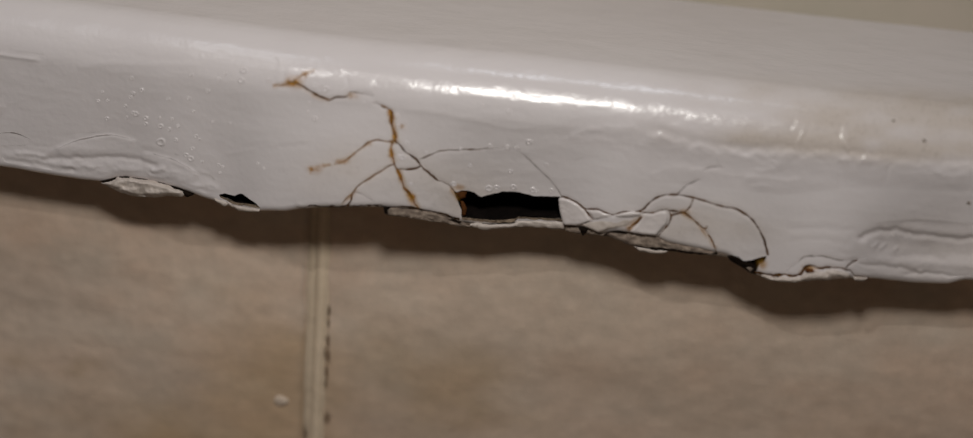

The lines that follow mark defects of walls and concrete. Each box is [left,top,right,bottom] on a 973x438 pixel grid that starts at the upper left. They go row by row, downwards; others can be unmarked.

peeling [101,176,194,198]
spalling [214,194,260,212]
crack [281,82,868,278]
spalling [295,190,867,282]